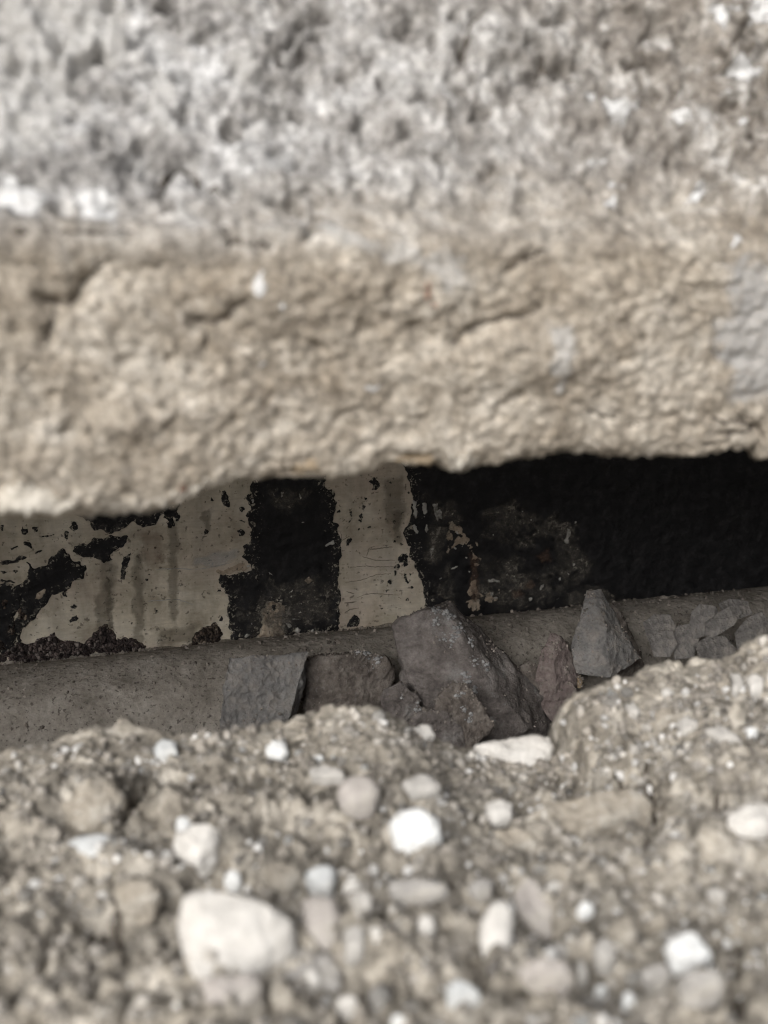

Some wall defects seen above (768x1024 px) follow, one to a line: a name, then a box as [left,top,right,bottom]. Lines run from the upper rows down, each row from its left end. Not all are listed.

peeling [0,505,180,663]
peeling [191,458,392,646]
peeling [380,447,768,617]